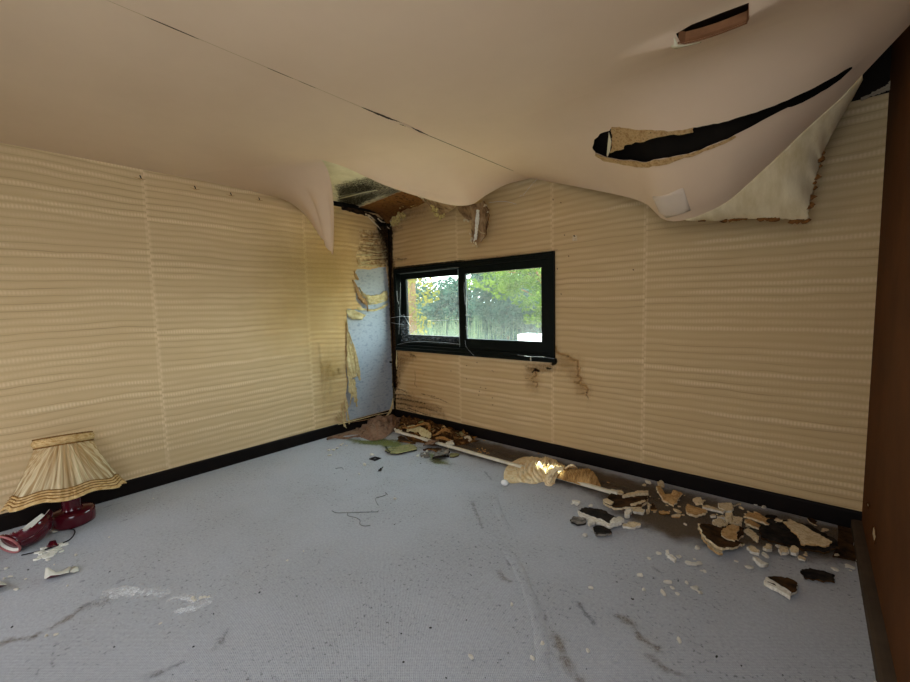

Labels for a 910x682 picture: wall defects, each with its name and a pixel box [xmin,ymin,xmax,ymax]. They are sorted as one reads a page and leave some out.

peeling [335,267,395,428]